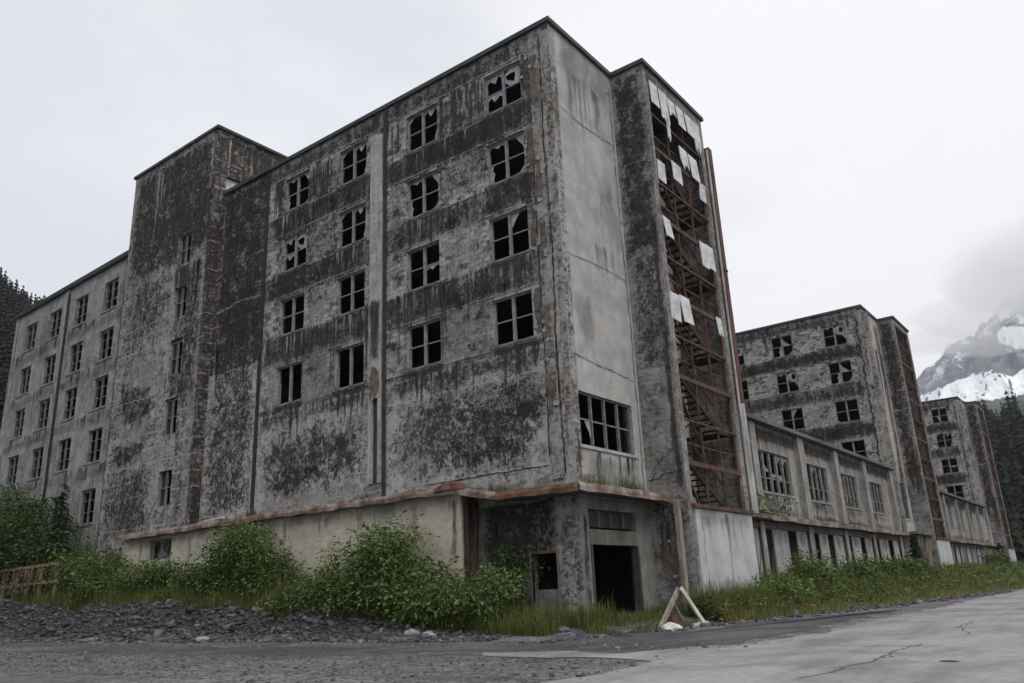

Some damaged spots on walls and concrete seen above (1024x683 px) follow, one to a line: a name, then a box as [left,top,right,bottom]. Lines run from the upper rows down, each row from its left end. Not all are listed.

water stain [104,135,215,525]
water stain [214,40,535,389]
water stain [389,340,543,402]
crack [851,316,908,462]